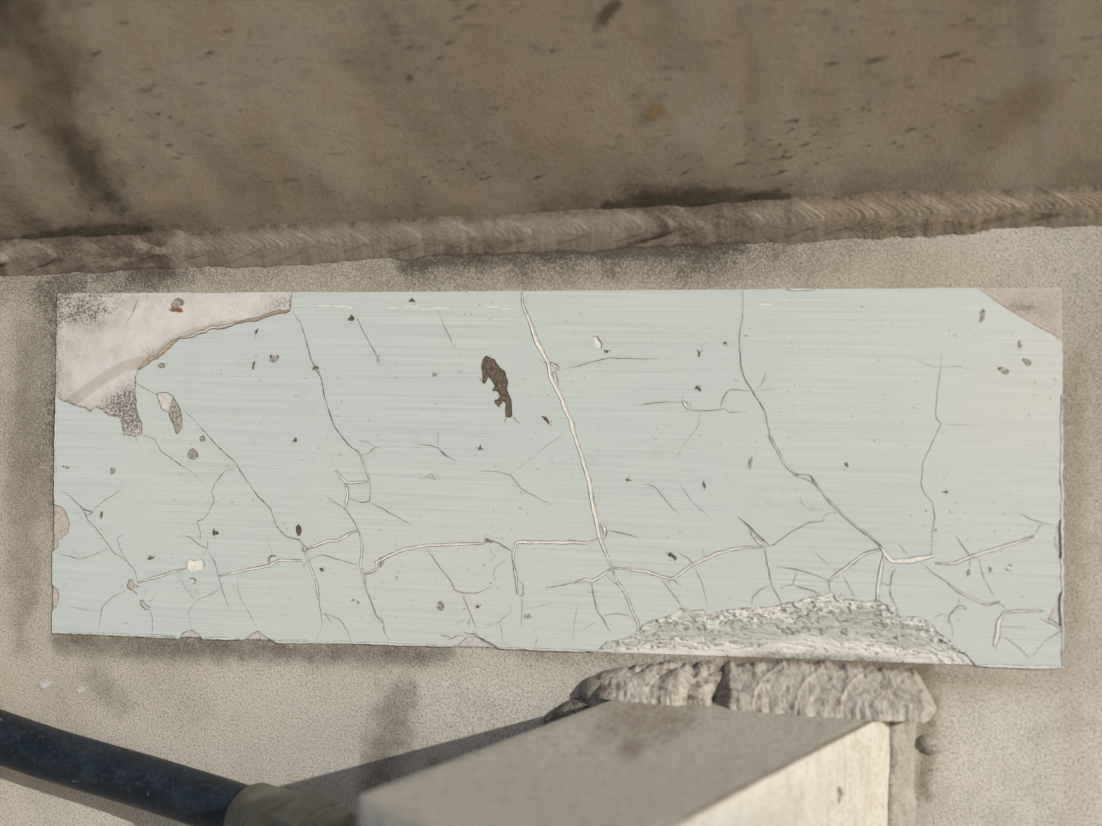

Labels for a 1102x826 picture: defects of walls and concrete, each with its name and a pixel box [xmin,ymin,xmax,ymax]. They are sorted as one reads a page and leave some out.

peeling [55,292,295,437]
crack [61,292,1062,658]
peeling [596,592,975,665]